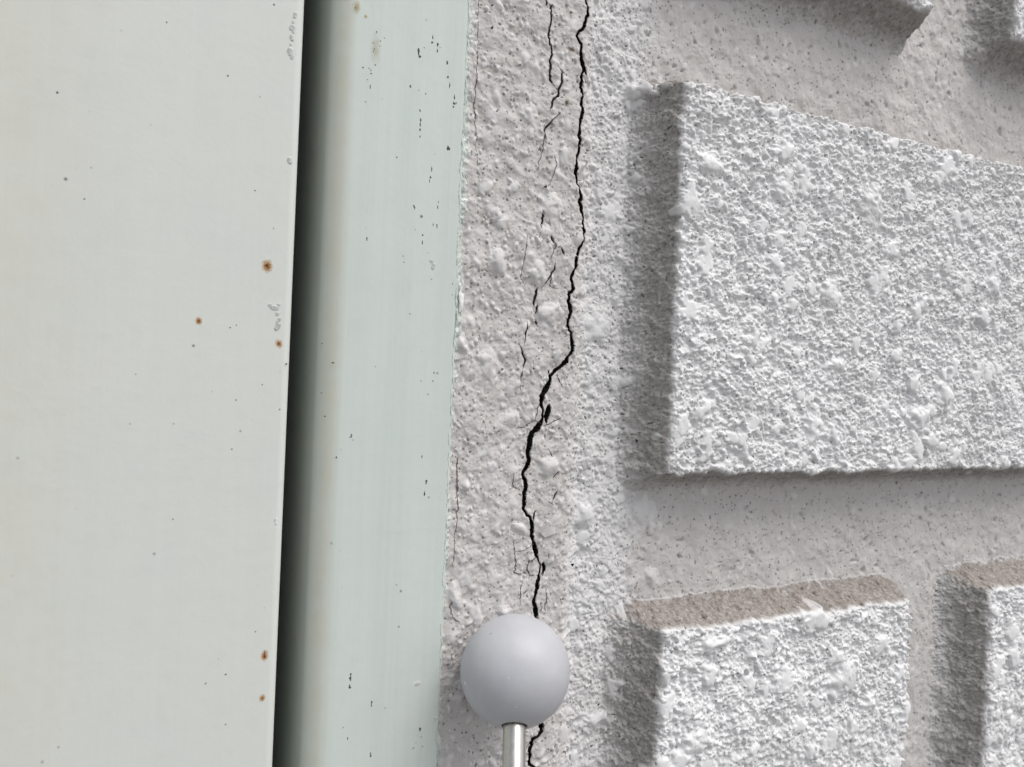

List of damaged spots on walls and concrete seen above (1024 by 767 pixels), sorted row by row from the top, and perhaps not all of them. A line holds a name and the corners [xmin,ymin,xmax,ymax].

crack [512,0,589,619]
crack [526,723,543,767]